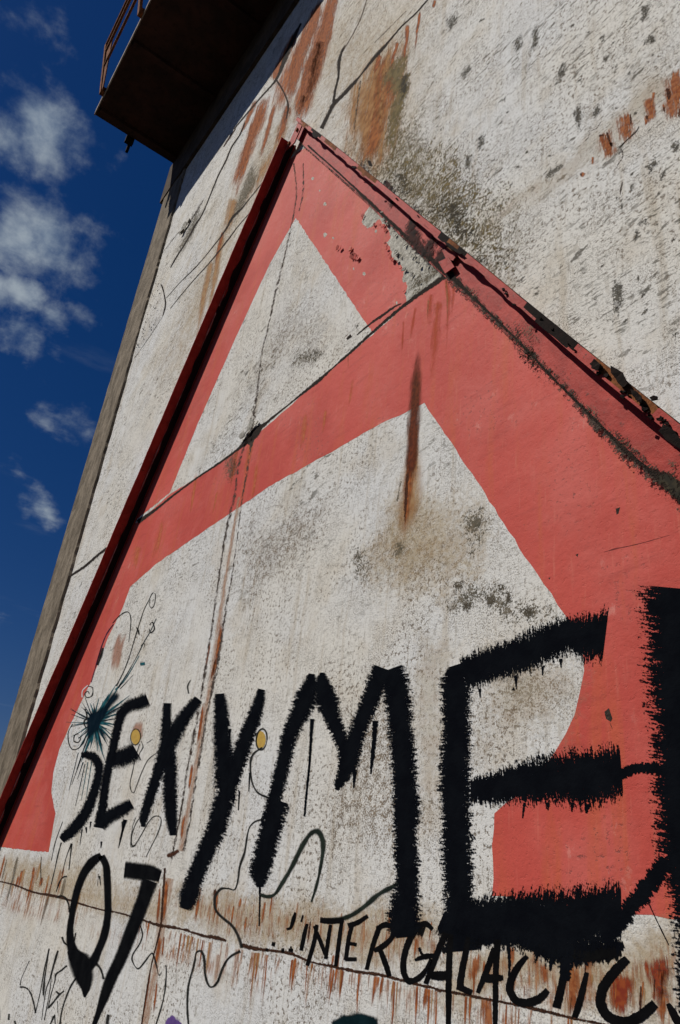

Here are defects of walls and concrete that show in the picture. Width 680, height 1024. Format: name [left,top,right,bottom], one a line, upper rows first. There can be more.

spalling [511,27,540,52]
spalling [639,5,660,57]
spalling [571,101,600,129]
mould [350,51,530,288]
peeling [361,207,442,314]
corrosion [199,0,680,449]
spalling [612,280,628,323]
corrosion [396,361,420,524]
crack [0,163,605,1024]
corrosion [166,930,437,1024]
corrosion [453,954,530,1024]
corrosion [610,957,673,1024]